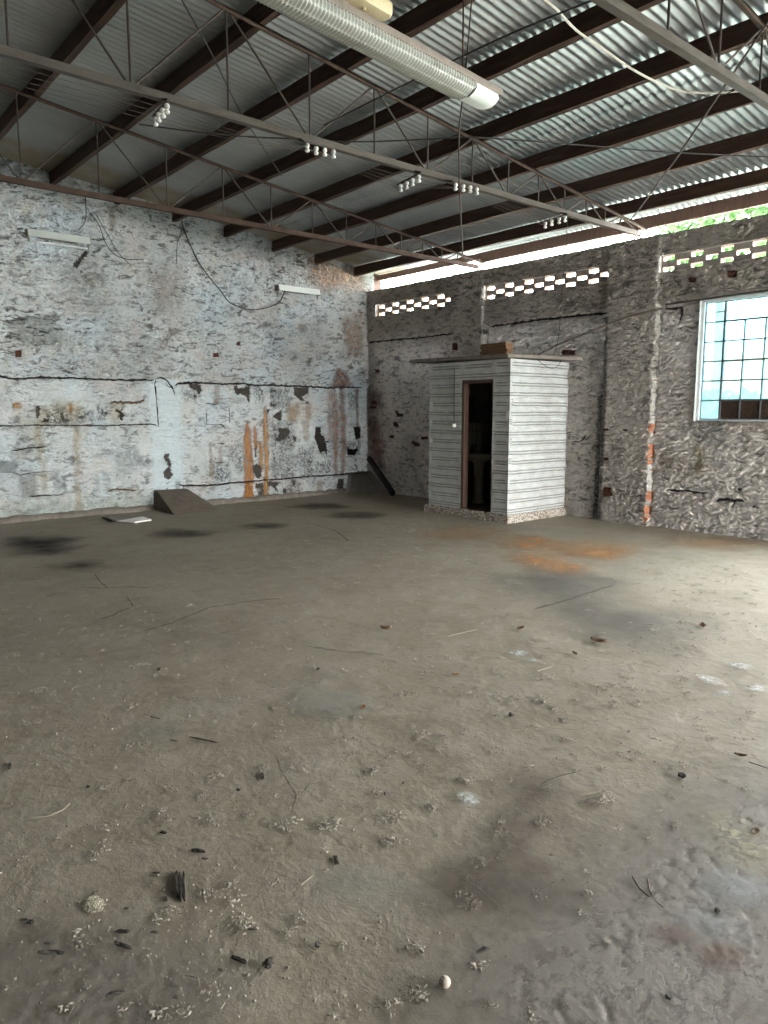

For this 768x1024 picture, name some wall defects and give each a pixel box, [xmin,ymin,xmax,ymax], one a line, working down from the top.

spalling [163,453,173,484]
crack [0,375,362,497]
spalling [185,383,203,400]
corrosion [244,407,269,497]
peeling [212,386,331,495]
spalling [346,425,361,457]
flaking render [641,384,656,525]
crack [668,489,744,507]